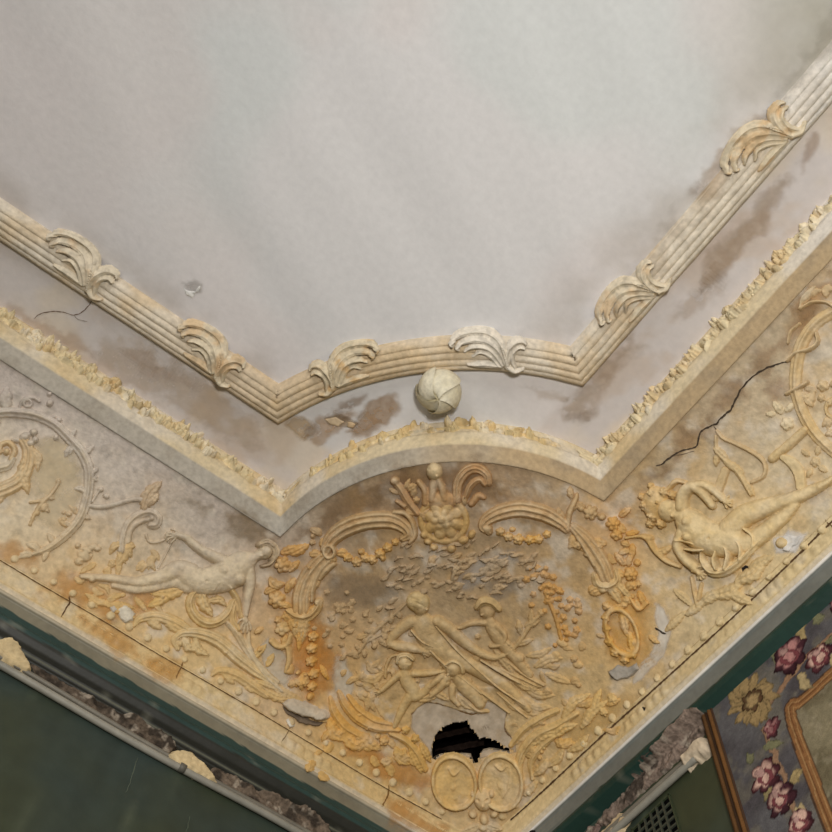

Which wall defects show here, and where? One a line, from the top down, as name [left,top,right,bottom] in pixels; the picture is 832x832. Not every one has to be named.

damp [352,398,395,434]
crack [656,361,791,466]
flaking render [31,664,177,753]
flaking render [261,639,290,684]
flaking render [282,698,330,728]
flaking render [333,657,353,700]
flaking render [411,700,516,763]
flaking render [211,767,331,832]
flaking render [586,707,706,832]